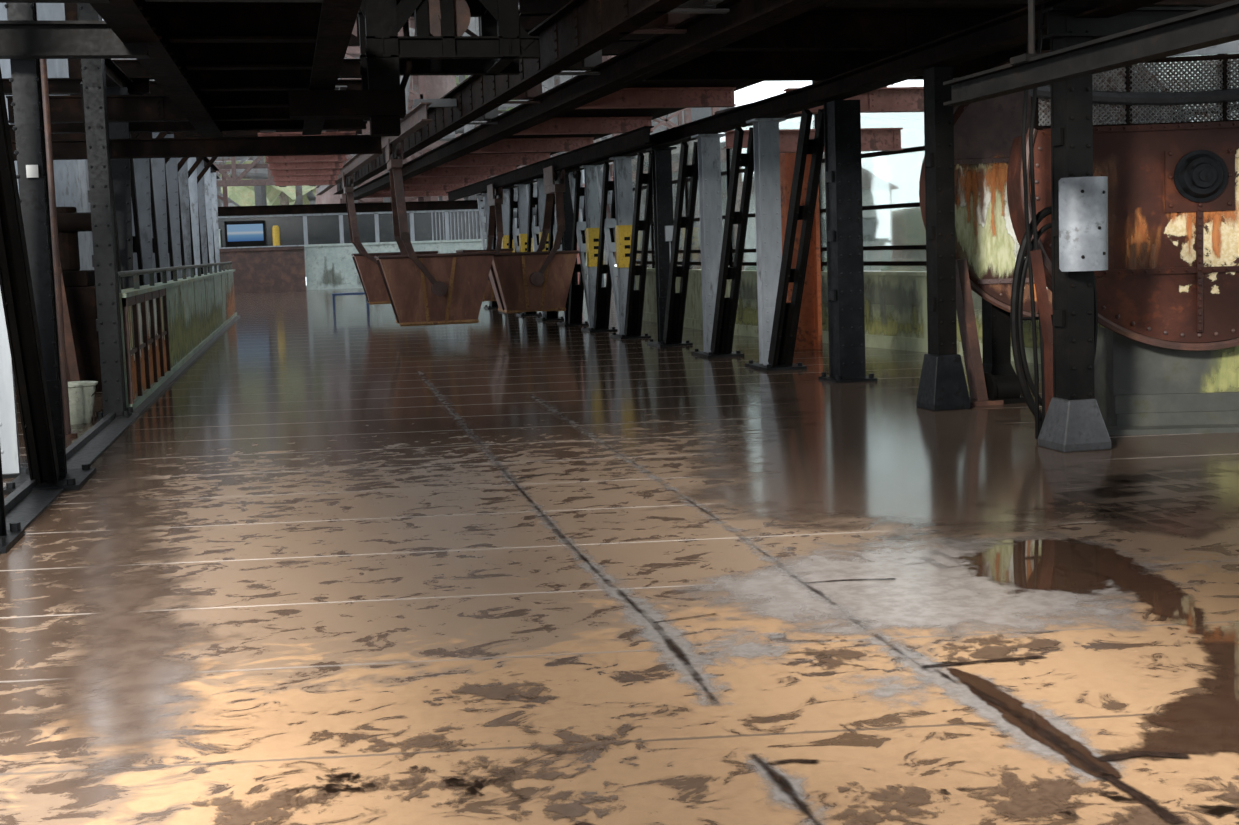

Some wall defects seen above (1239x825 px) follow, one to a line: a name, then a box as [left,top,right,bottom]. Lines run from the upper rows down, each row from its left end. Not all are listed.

corrosion [954,157,1008,236]
peeling [955,164,1020,277]
corrosion [1093,161,1158,269]
peeling [1164,149,1239,294]
corrosion [1171,206,1237,258]
corrosion [991,283,1052,304]
crack [420,372,726,705]
crack [532,394,1189,825]
damp [934,632,1060,665]